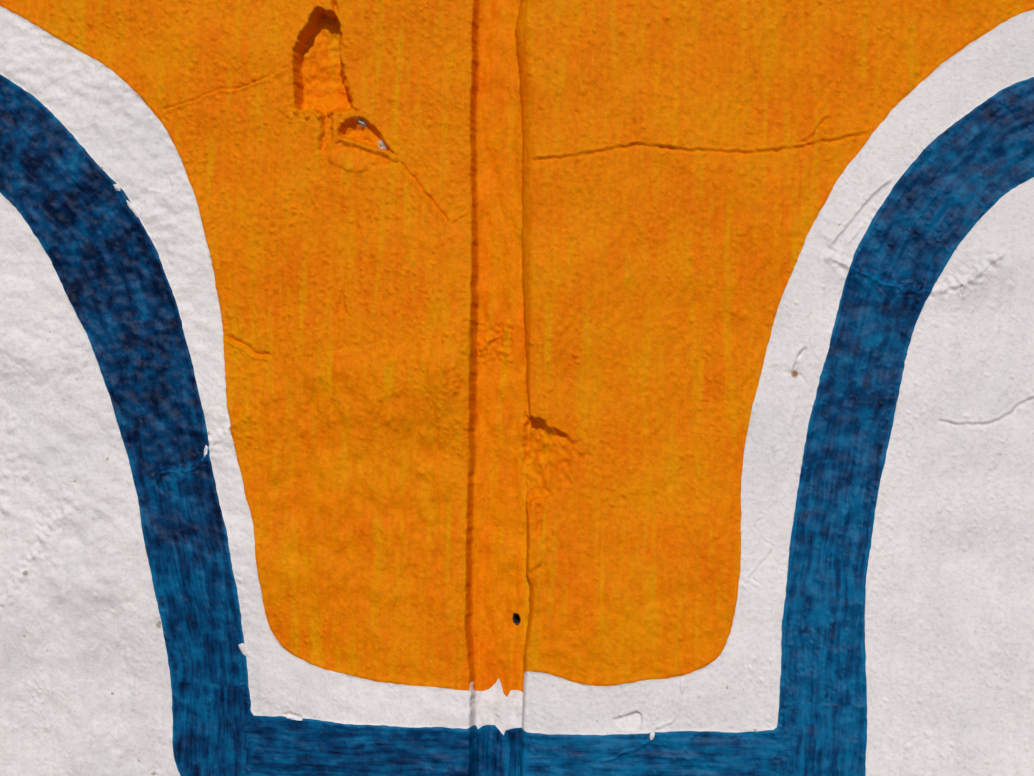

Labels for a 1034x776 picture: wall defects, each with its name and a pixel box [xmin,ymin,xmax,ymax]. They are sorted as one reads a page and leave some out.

flaking render [292,0,400,175]
crack [525,113,880,165]
crack [812,244,1014,298]
crack [930,392,1034,429]
crack [149,403,250,489]